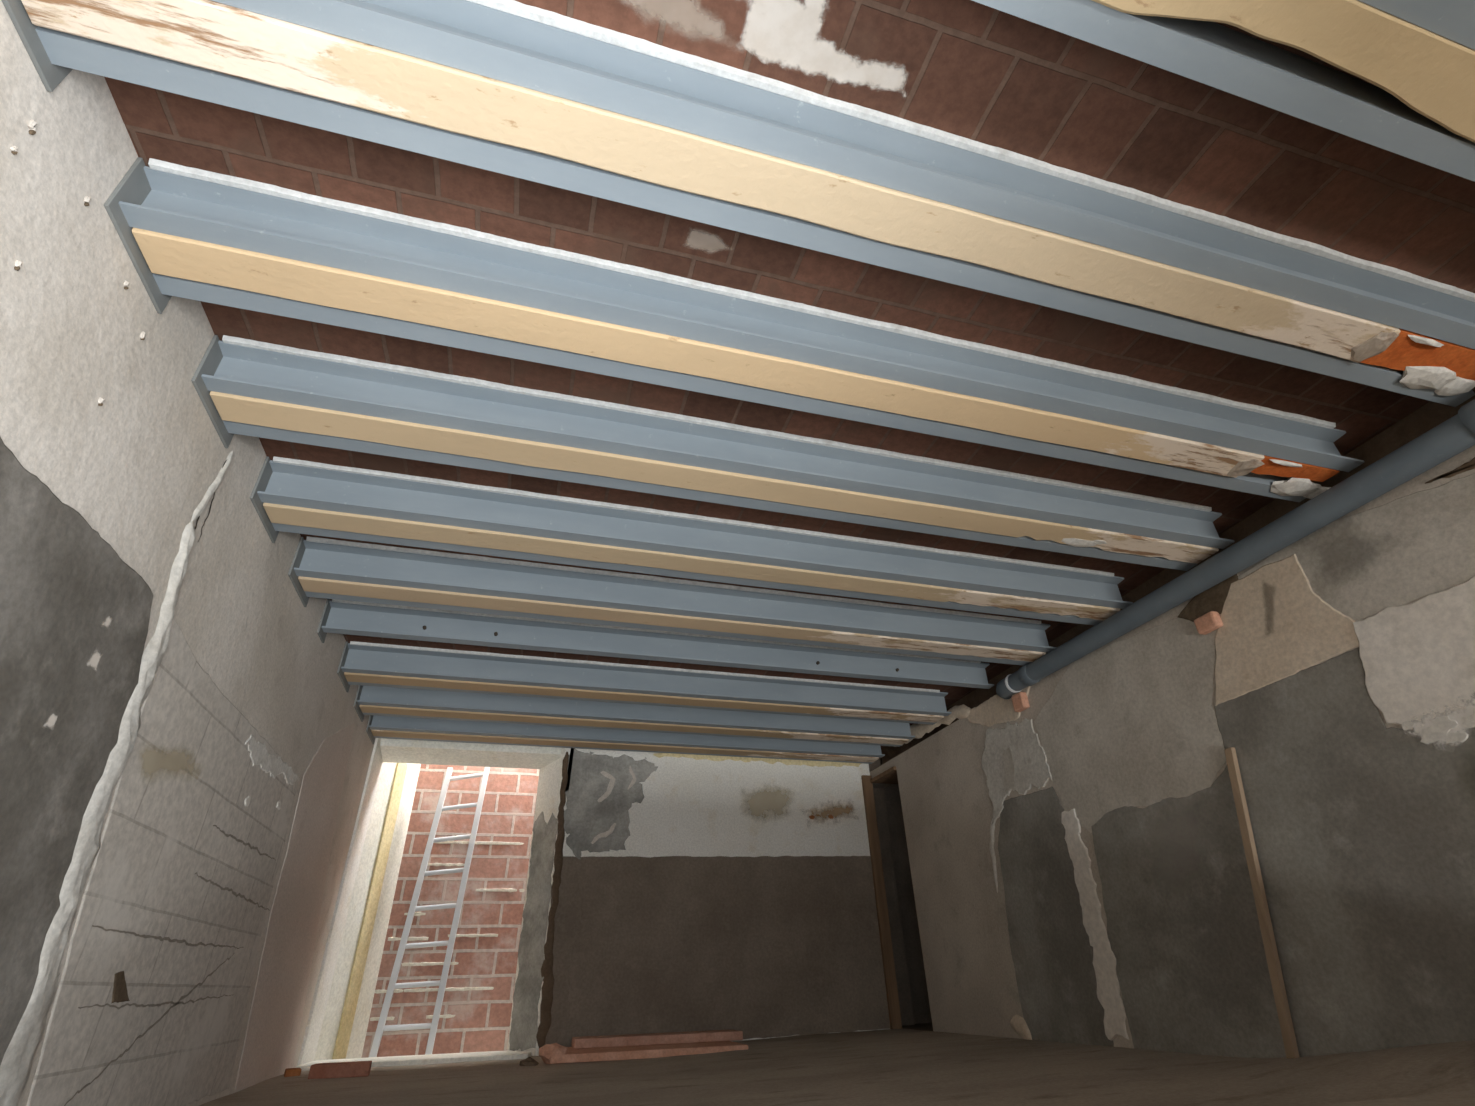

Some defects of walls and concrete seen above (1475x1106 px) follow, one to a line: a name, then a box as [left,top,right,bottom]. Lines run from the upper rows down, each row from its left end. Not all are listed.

flaking render [1402,698,1475,748]
crack [213,825,275,859]
crack [195,872,270,911]
crack [64,925,243,1106]